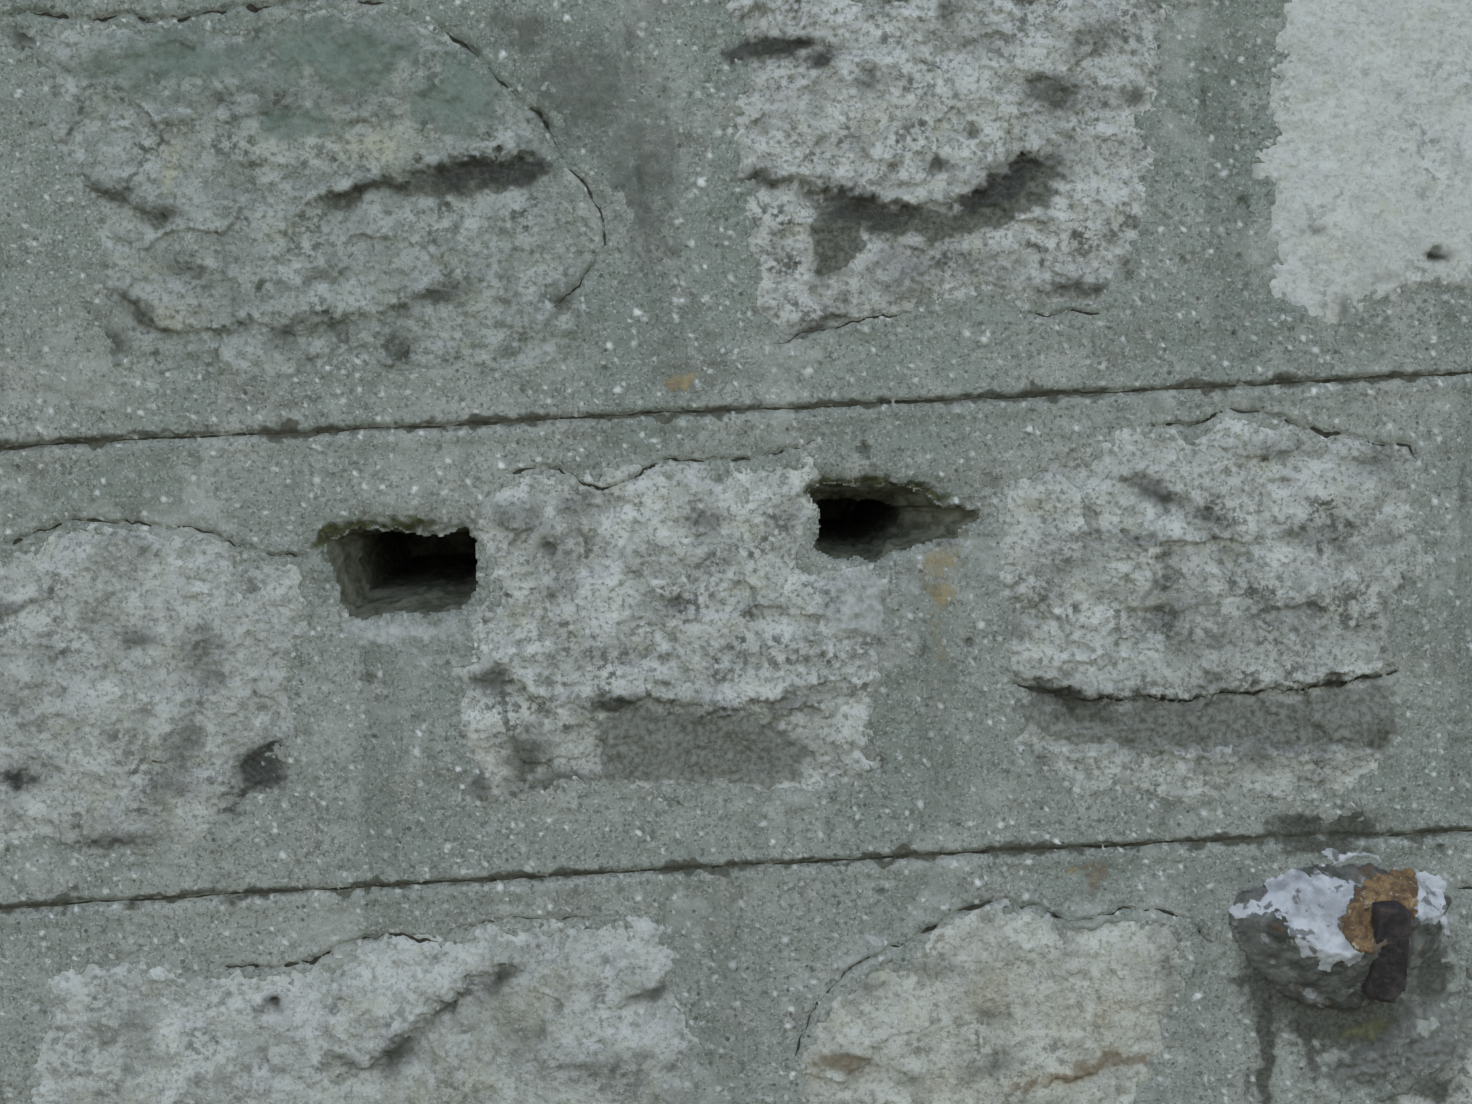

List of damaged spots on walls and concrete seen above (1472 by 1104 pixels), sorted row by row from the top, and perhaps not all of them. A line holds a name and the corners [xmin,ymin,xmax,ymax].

corrosion [1339,867,1419,954]